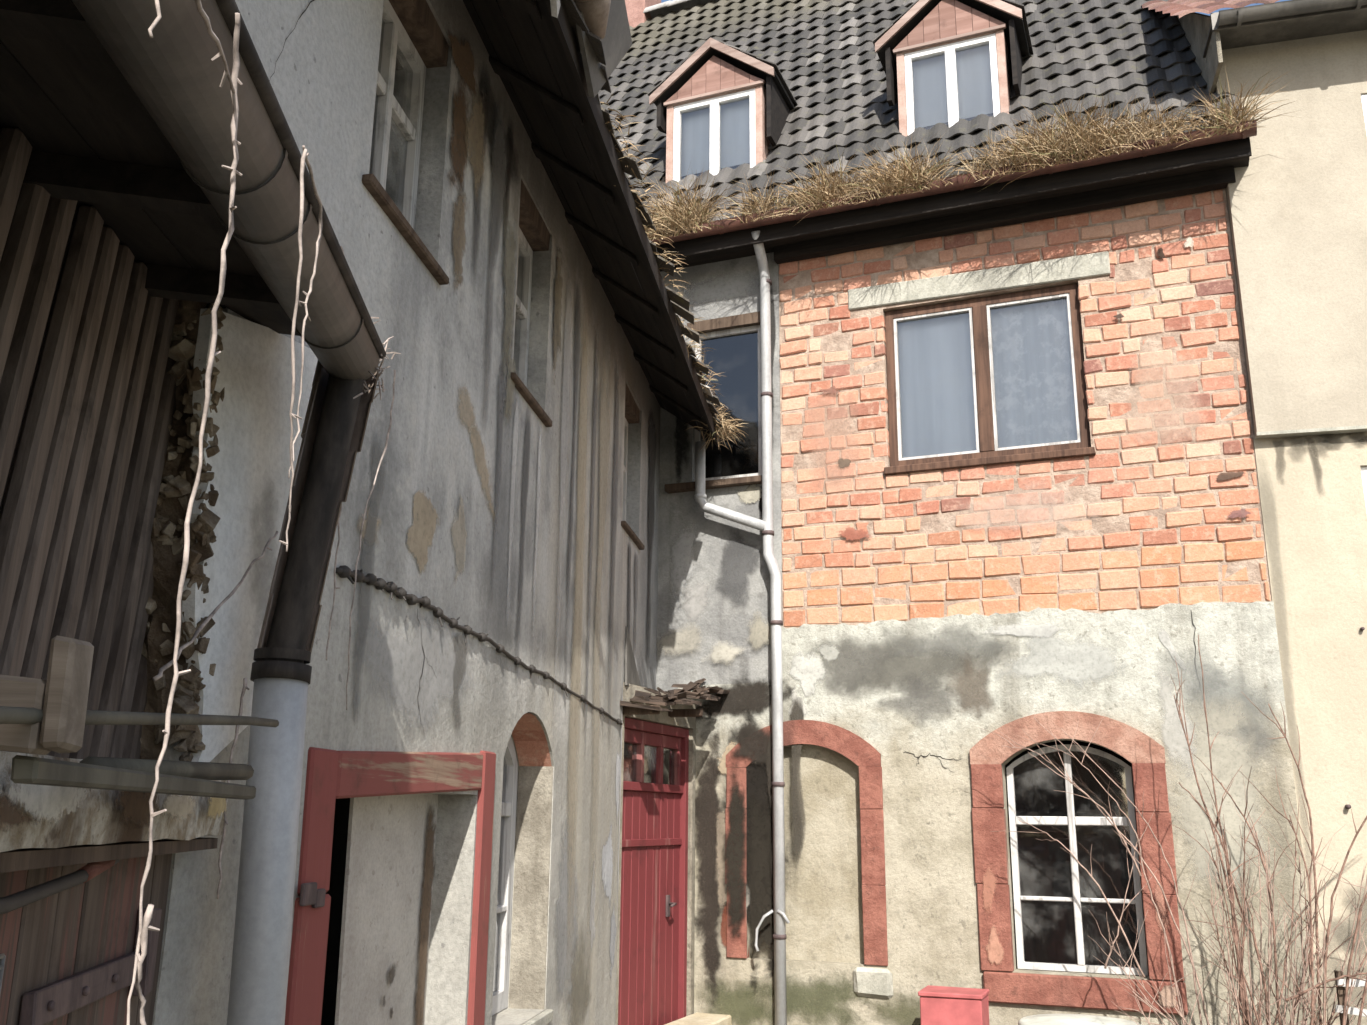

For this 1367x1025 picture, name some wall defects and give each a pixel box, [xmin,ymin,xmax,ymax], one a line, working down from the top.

crack [269,0,314,81]
flaking render [449,33,485,288]
water stain [474,71,541,635]
flaking render [459,389,495,517]
water stain [1274,432,1367,481]
flaking render [407,491,467,579]
water stain [556,290,656,1025]
water stain [828,630,1001,719]
crack [903,751,961,769]
spalling [0,781,87,832]
spalling [115,791,227,827]
water stain [695,680,805,993]